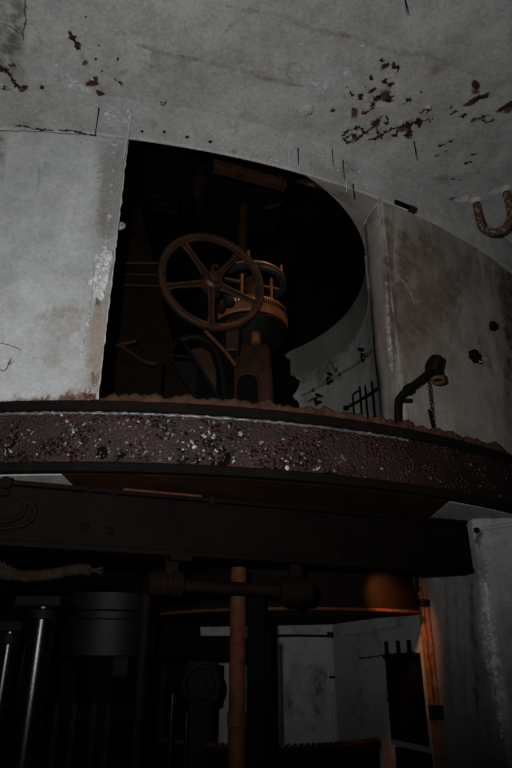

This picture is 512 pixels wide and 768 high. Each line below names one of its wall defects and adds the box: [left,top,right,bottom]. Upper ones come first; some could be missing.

crack [0,63,28,92]
crack [16,125,96,136]